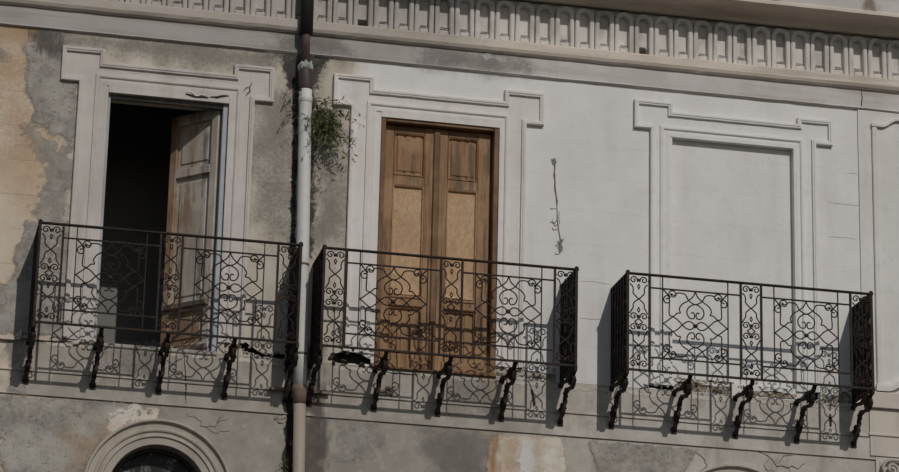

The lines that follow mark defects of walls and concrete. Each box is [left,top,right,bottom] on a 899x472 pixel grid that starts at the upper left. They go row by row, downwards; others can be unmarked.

peeling [0,29,160,472]
spalling [223,342,286,362]
spalling [494,363,557,382]
crack [167,357,229,434]
spalling [644,378,797,402]
spalling [815,387,852,406]
crack [759,452,806,472]